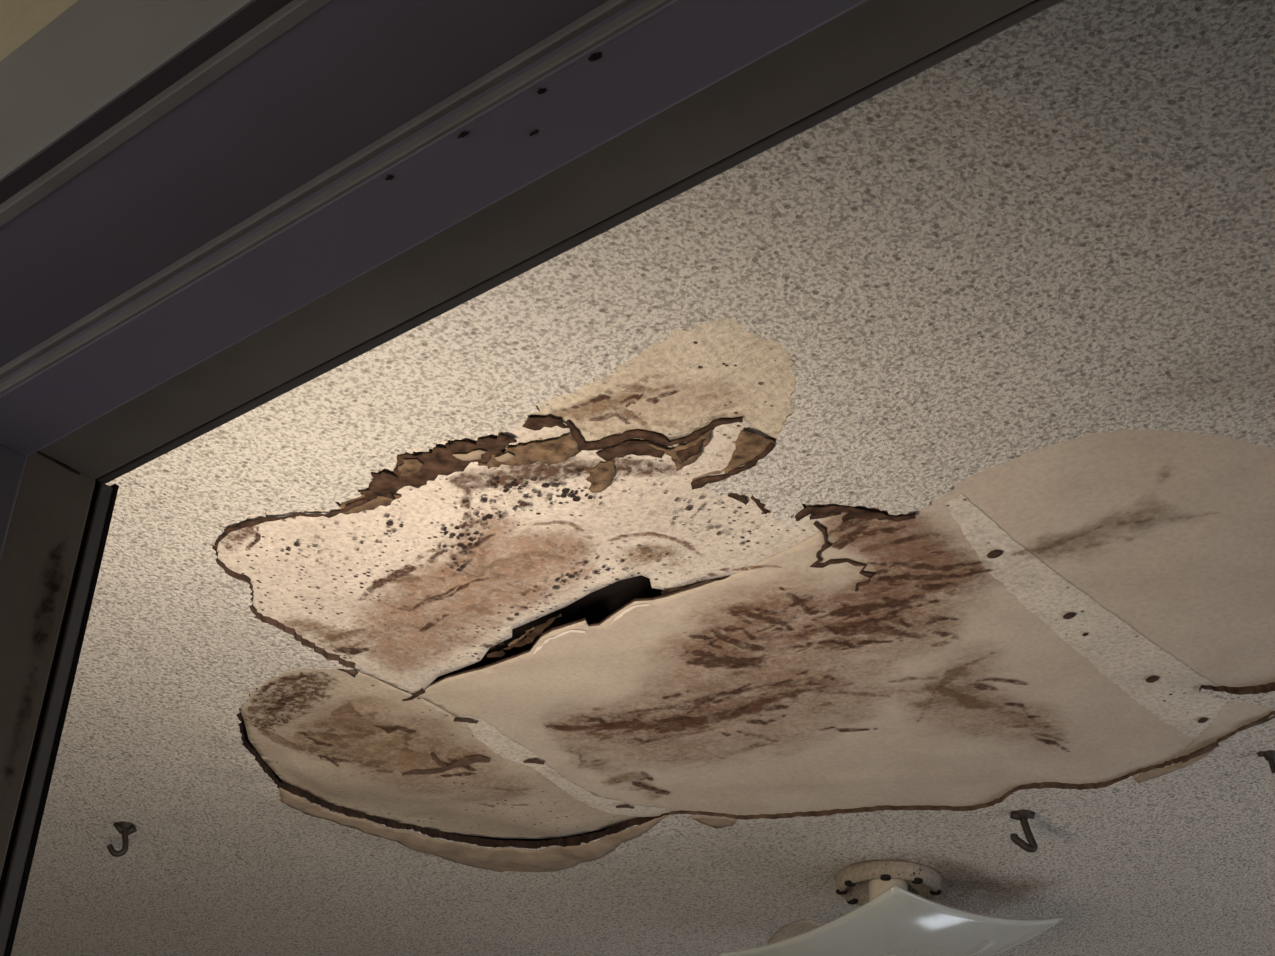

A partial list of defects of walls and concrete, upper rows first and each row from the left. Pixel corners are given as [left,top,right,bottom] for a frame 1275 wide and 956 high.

water stain [560,377,677,426]
water stain [244,672,485,789]
water stain [289,459,758,671]
crack [402,575,729,701]
peeling [212,318,1275,829]
water stain [550,510,1069,798]